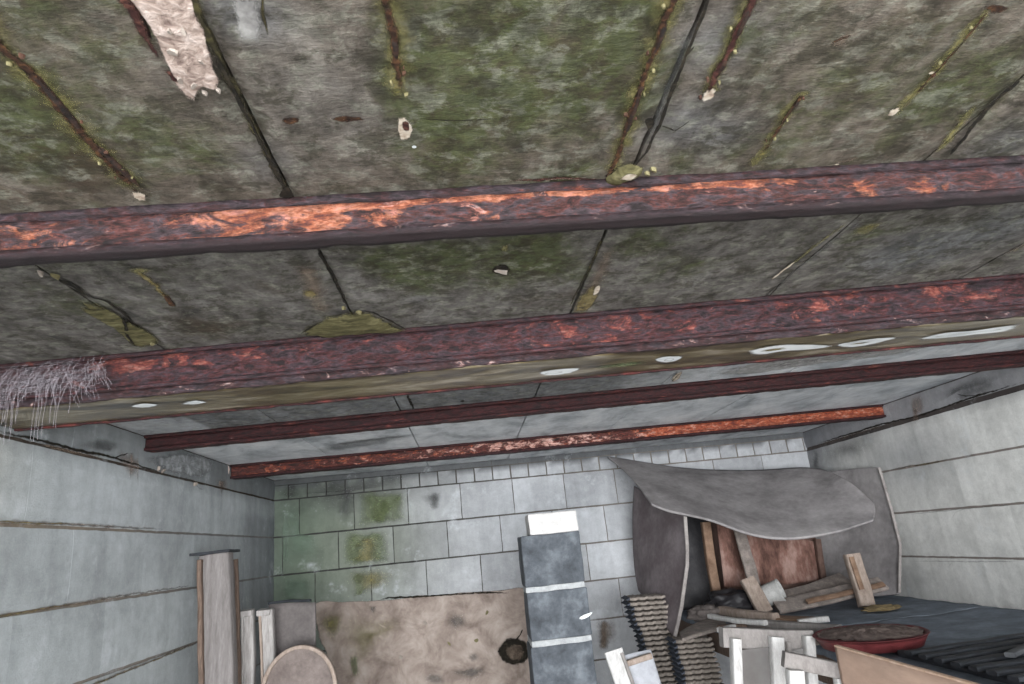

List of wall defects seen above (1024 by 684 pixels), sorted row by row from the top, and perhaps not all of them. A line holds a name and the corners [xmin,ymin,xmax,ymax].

spalling [118,0,221,98]
crack [191,0,293,198]
water stain [235,0,268,37]
crack [635,0,709,165]